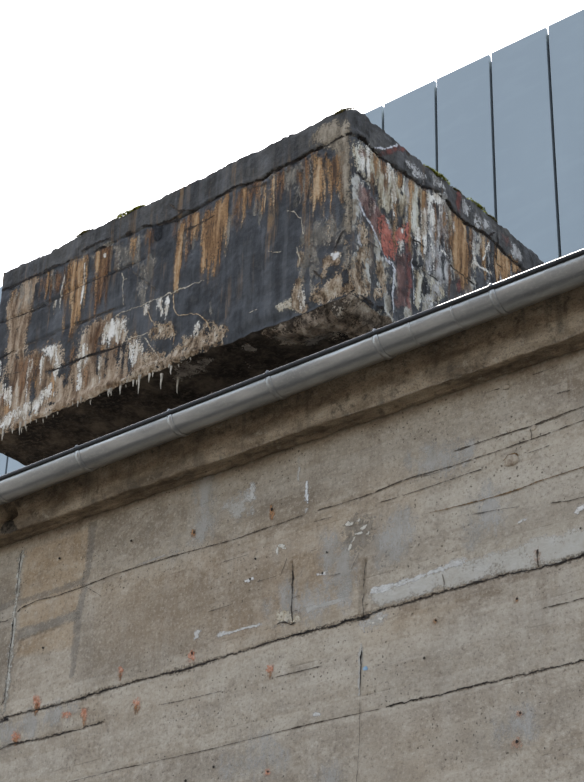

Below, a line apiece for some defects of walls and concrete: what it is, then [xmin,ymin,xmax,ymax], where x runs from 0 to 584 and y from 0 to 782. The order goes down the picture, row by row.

rust [11,246,110,341]
damp [0,318,214,439]
damp [141,295,170,318]
rust [173,169,284,292]
damp [262,292,392,346]
peeling [270,118,452,314]
rust [370,154,521,292]
peeling [462,199,489,247]
peeling [510,242,523,261]
crack [0,390,584,720]
crack [0,721,103,750]
crack [69,645,584,782]